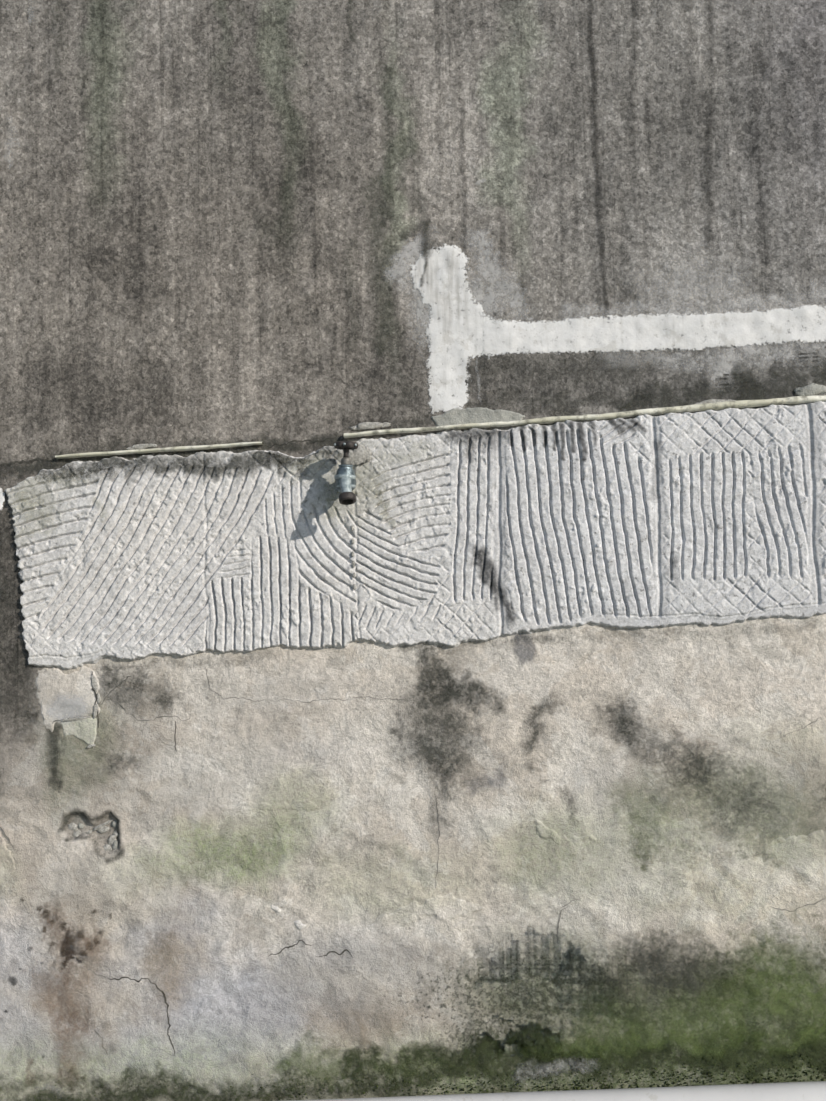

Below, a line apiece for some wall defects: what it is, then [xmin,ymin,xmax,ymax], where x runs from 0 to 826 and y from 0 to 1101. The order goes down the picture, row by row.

damp [609,364,826,432]
damp [451,400,596,461]
damp [475,550,513,621]
flaking render [35,666,101,749]
crack [205,667,415,703]
damp [405,657,503,776]
spalling [59,811,123,861]
damp [38,908,102,956]
crack [269,940,351,957]
damp [601,938,712,994]
crack [86,968,175,1056]
damp [280,1024,826,1080]